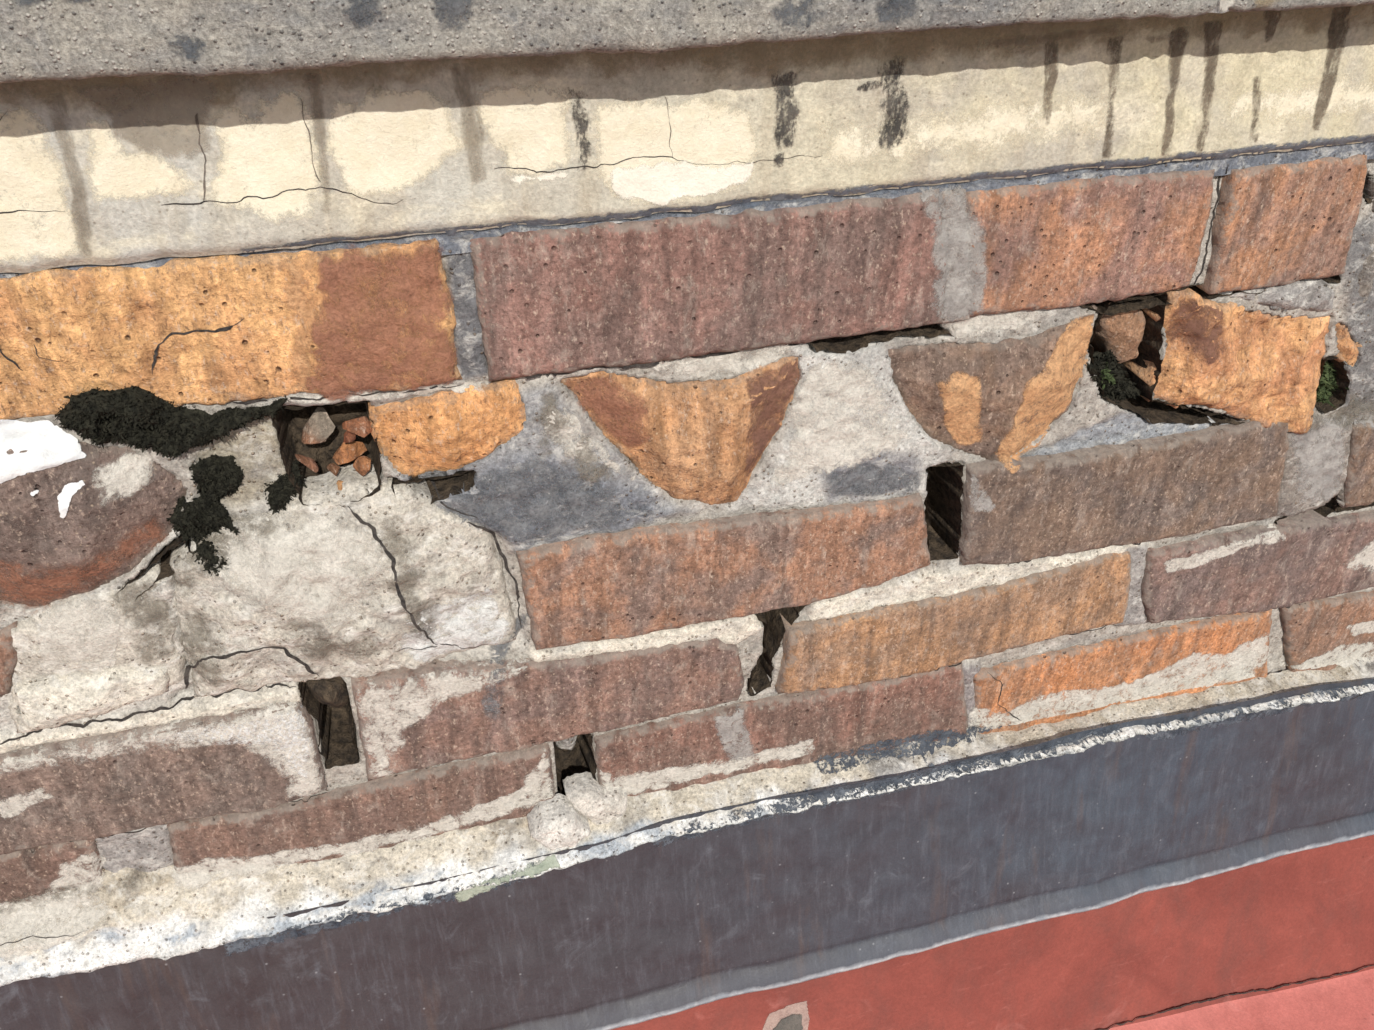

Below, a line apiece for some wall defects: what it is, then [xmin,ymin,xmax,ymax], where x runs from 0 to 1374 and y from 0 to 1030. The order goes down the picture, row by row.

crack [0,208,63,216]
leakage [4,58,449,155]
crack [164,99,402,205]
leakage [467,54,572,71]
leakage [591,0,1372,157]
crack [0,345,60,371]
spalling [0,90,526,508]
spalling [560,356,801,505]
spalling [810,283,1362,561]
spalling [0,442,194,607]
crack [348,506,486,652]
peeling [747,604,810,696]